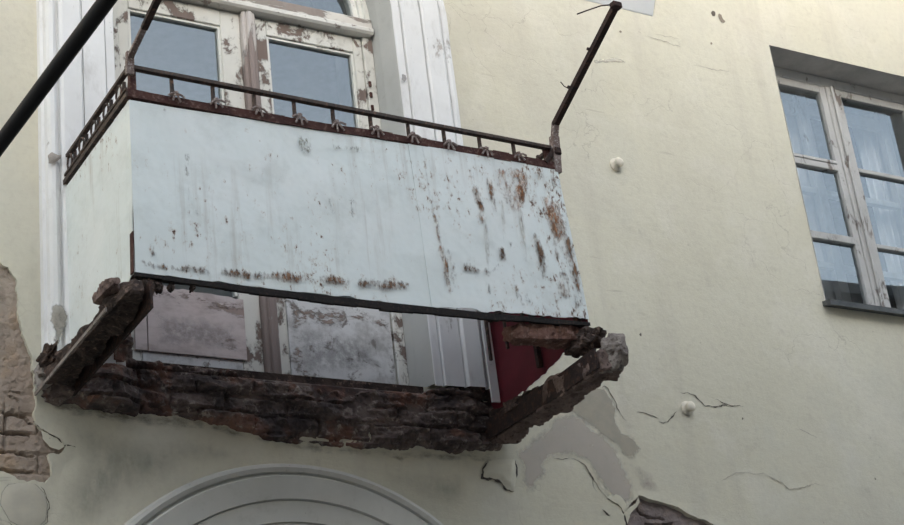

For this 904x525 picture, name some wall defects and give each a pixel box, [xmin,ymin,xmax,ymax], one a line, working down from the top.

corrosion [472,169,527,232]
corrosion [433,215,487,291]
corrosion [534,233,545,272]
corrosion [545,199,581,306]
corrosion [224,269,302,282]
corrosion [358,278,408,289]
flaking render [51,305,67,343]
peeling [293,310,363,326]
flaking render [0,267,64,482]
peeling [573,389,639,456]
crack [600,386,743,424]
flaking render [625,497,707,525]